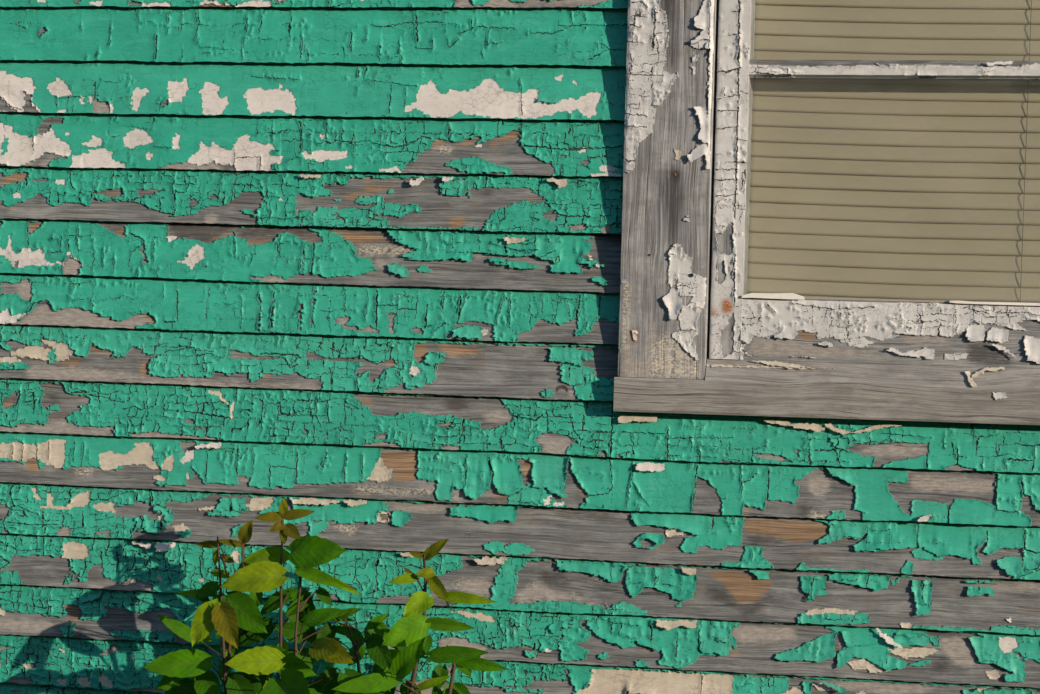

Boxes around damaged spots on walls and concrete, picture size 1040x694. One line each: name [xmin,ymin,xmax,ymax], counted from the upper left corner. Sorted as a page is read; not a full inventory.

crack [1,0,669,315]
peeling [0,0,1040,430]
crack [670,0,1040,360]
crack [0,276,1040,694]
peeling [0,337,1040,694]